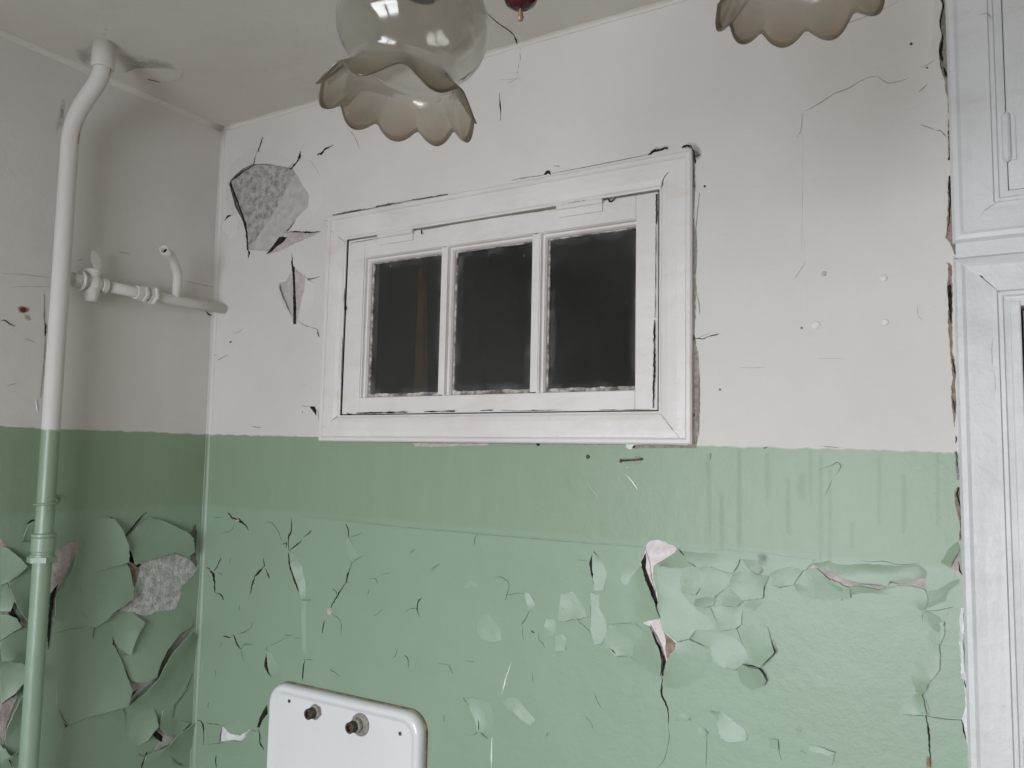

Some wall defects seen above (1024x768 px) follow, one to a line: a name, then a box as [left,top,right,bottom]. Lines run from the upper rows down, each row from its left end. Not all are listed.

peeling [221,137,448,336]
crack [795,60,934,303]
spalling [302,338,407,422]
peeling [0,539,31,768]
peeling [47,512,198,768]
crack [216,513,248,534]
crack [198,702,268,768]
crack [208,558,293,677]
crack [322,525,388,633]
crack [501,577,535,637]
peeling [531,540,928,767]
peeling [898,608,968,768]